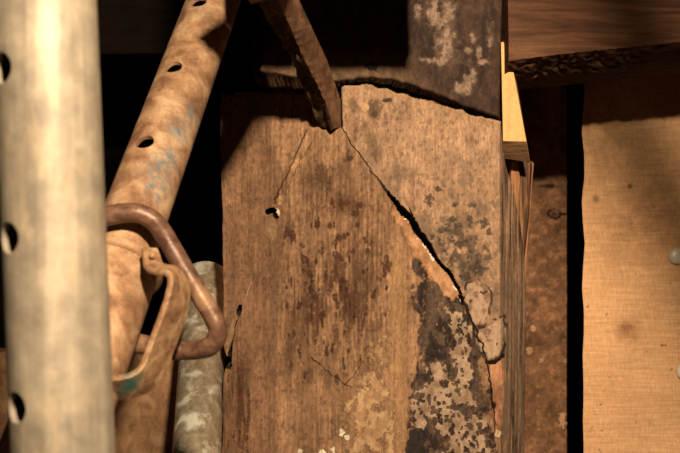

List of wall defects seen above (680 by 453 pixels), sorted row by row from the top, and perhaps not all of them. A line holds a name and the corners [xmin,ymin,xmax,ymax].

damp [415,0,457,66]
damp [455,34,493,95]
crack [340,82,498,425]
damp [296,256,377,355]
damp [406,258,497,453]